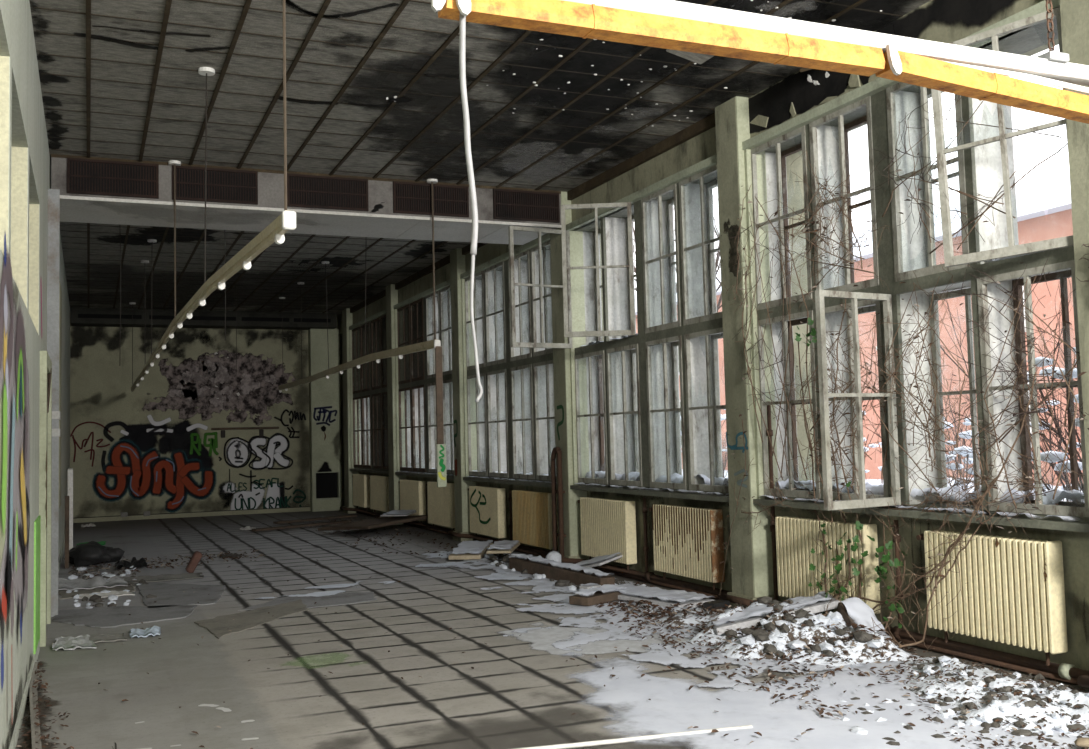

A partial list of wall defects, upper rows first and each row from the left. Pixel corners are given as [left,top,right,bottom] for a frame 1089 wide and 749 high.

flaking render [877,23,895,35]
water stain [274,96,390,107]
flaking render [748,69,870,134]
water stain [503,142,609,183]
flaking render [132,350,295,425]
water stain [411,708,686,749]